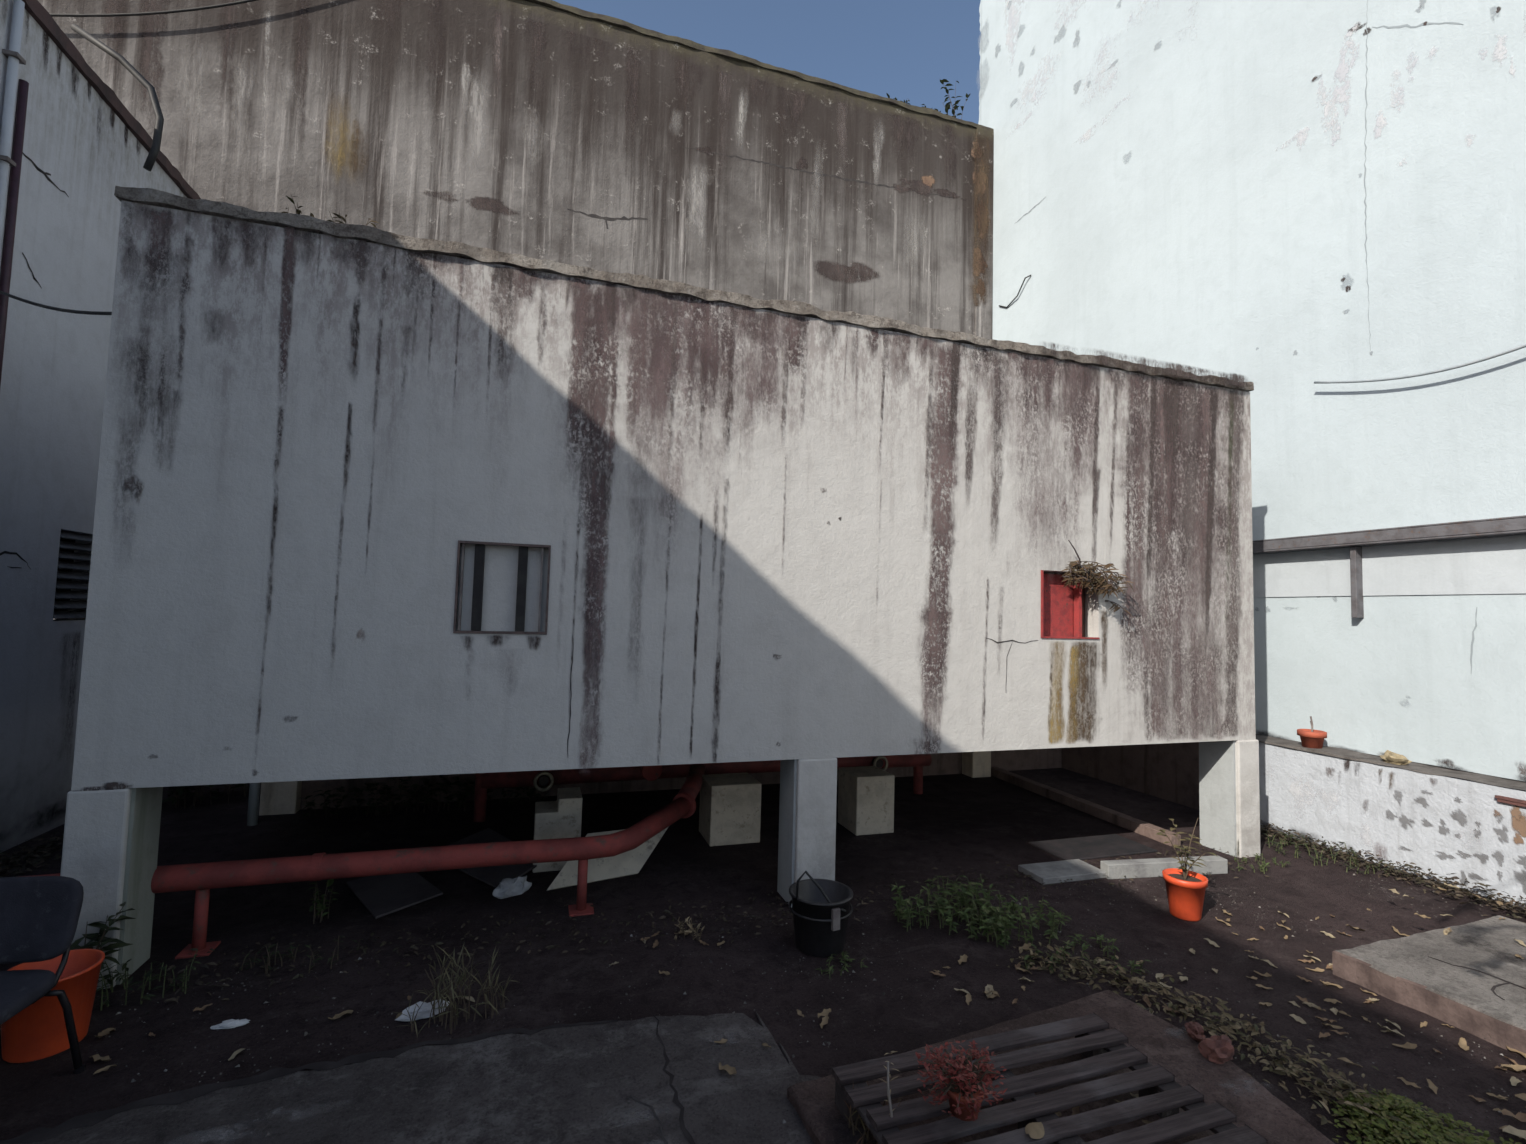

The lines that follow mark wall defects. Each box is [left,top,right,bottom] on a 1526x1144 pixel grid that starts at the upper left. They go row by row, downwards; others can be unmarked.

damp [426,192,517,215]
damp [125,209,192,404]
damp [279,226,319,383]
damp [351,300,360,367]
damp [816,261,878,283]
damp [344,404,352,486]
damp [267,500,278,607]
damp [488,266,808,766]
damp [845,328,1248,810]
corrosion [1049,612,1107,743]
peeling [1387,790,1526,894]
crack [0,1015,695,1144]